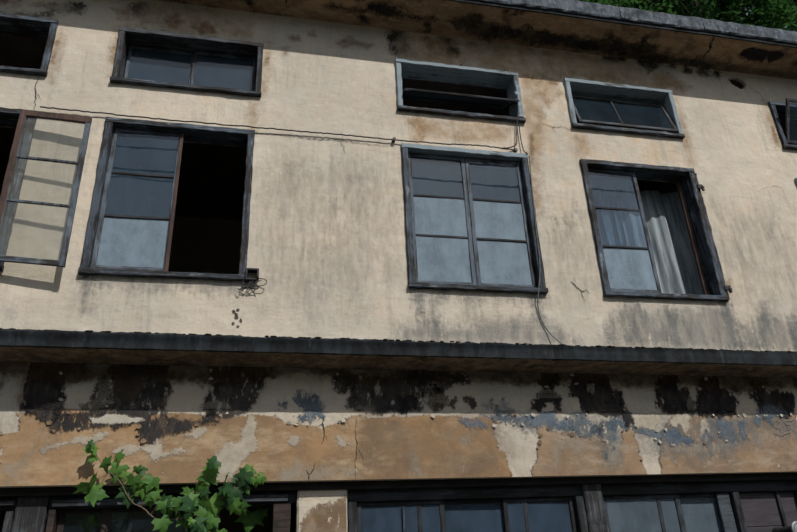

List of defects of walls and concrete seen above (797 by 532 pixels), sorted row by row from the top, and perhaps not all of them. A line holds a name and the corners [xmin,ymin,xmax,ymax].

water stain [327,0,438,32]
water stain [448,8,738,77]
water stain [740,48,785,75]
flaking render [0,363,797,486]
flaking render [300,497,347,532]